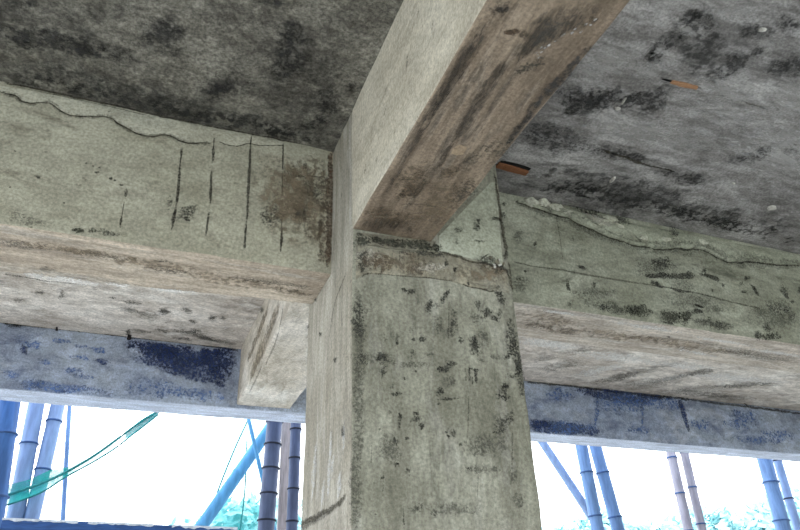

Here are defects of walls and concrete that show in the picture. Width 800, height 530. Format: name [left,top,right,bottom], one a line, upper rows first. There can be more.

leakage [5,26,136,61]
crack [0,82,298,147]
leakage [24,67,322,252]
leakage [364,40,505,231]
crack [329,174,800,336]
leakage [507,47,669,155]
crack [602,149,675,172]
leakage [546,168,741,239]
leakage [647,257,725,293]
leakage [589,7,800,162]
leakage [448,314,479,355]
leakage [475,285,577,401]